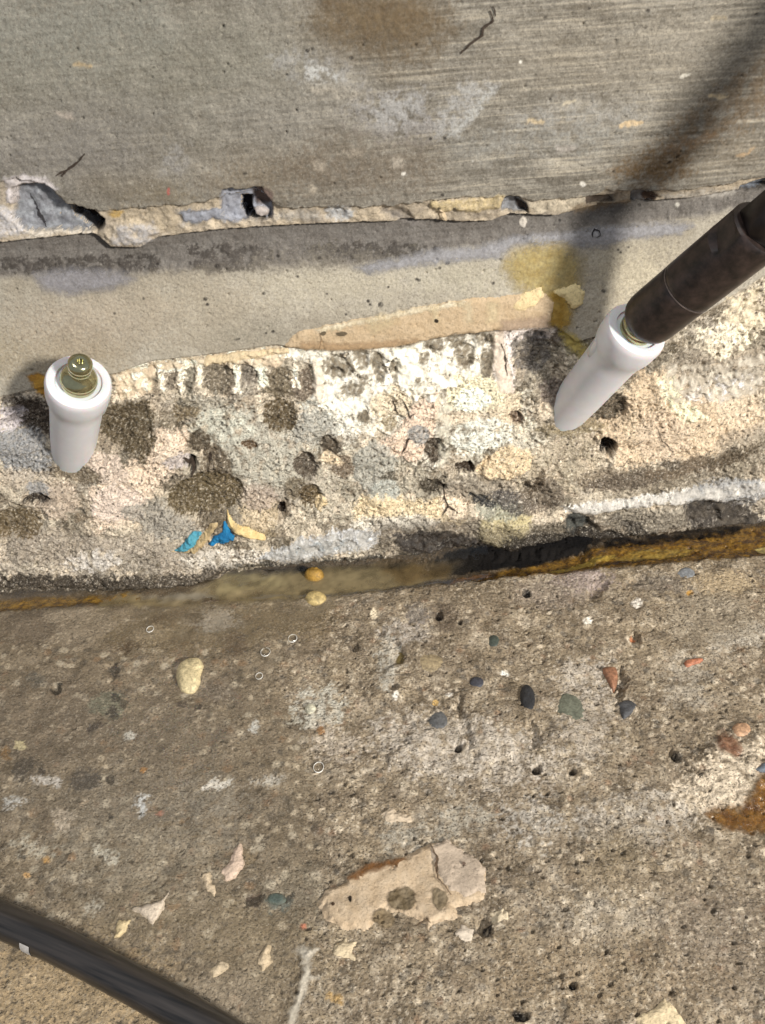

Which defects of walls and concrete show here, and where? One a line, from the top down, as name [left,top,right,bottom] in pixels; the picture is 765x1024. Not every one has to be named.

spalling [4,174,105,230]
spalling [181,186,273,223]
spalling [0,276,765,593]
corrosion [450,526,765,585]
corrosion [718,735,742,757]
corrosion [705,773,765,833]
peeling [318,839,486,942]